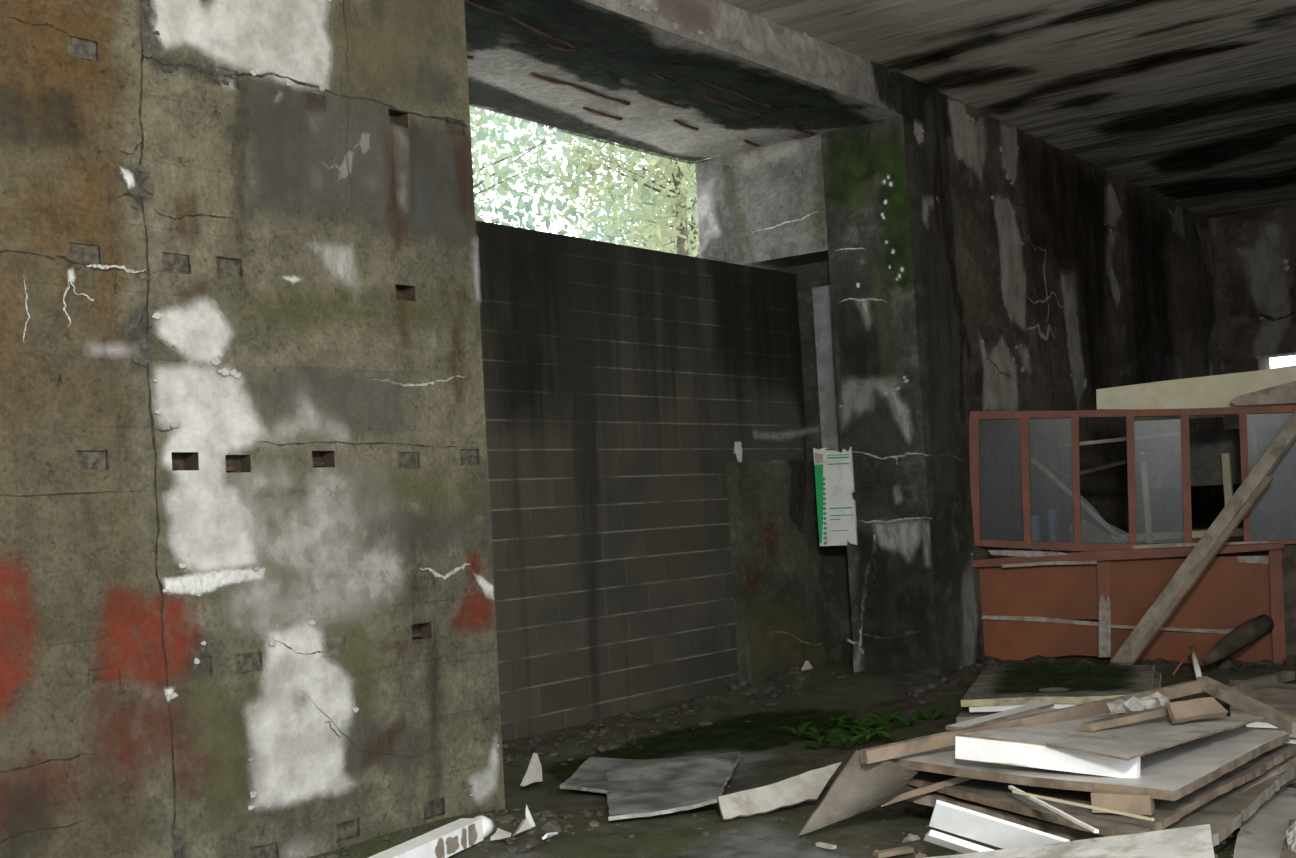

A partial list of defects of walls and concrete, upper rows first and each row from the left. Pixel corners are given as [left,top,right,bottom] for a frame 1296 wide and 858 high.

peeling [137,0,332,92]
leakage [468,78,709,164]
leakage [732,107,874,130]
flaking render [949,100,1026,328]
leakage [872,0,1296,495]
peeling [152,297,266,596]
crack [0,0,471,854]
leakage [839,301,879,380]
flaking render [812,285,909,452]
flaking render [980,338,1031,411]
flaking render [1060,272,1087,408]
peeling [244,620,359,810]